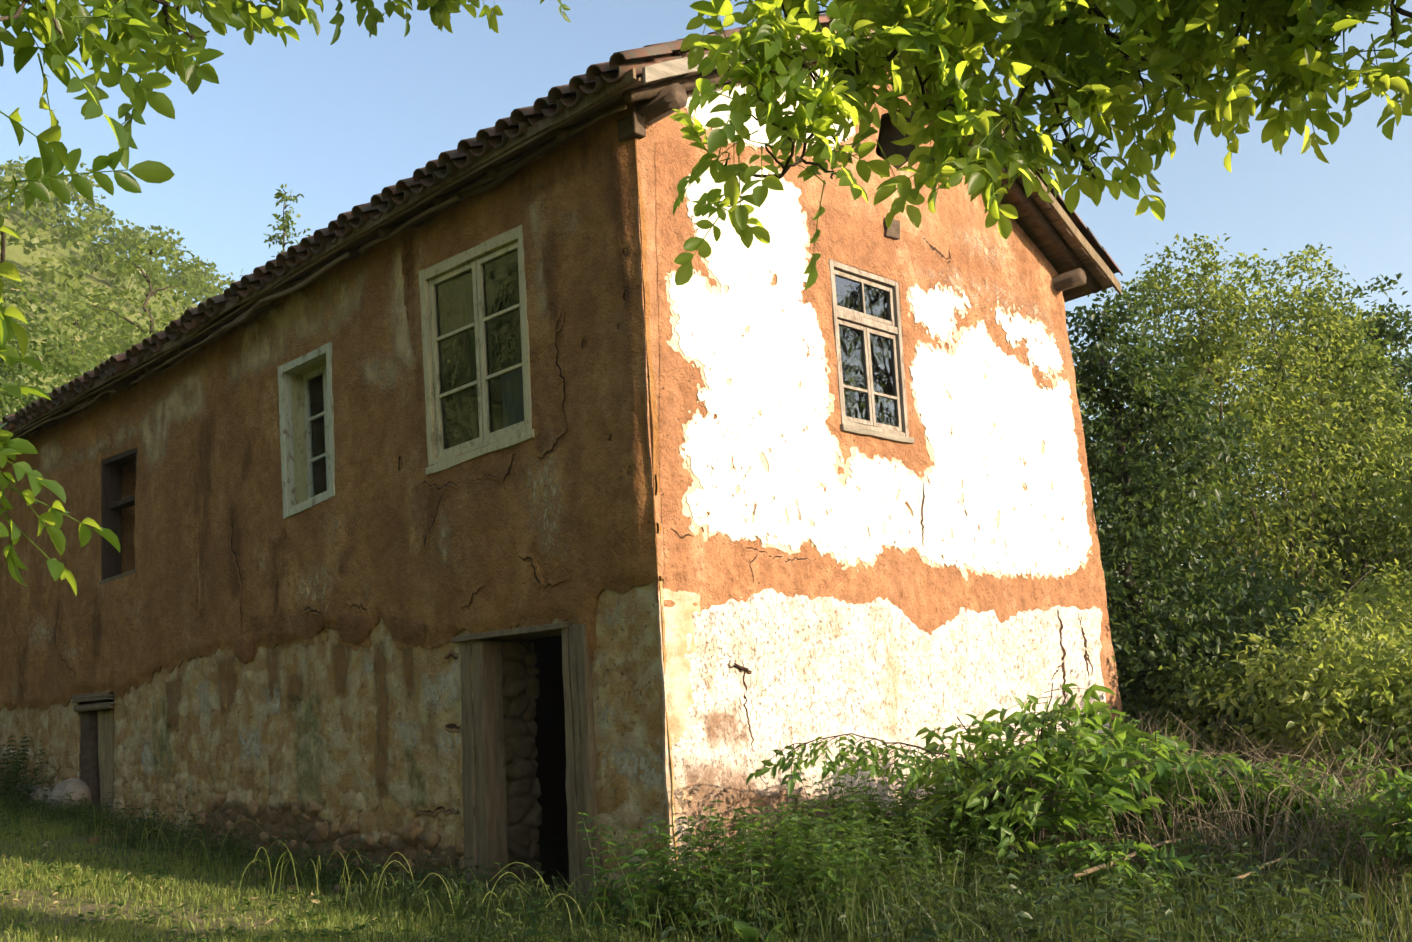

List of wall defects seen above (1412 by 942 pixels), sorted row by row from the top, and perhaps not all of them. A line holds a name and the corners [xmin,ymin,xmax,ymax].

crack [465,306,567,488]
flaking render [655,138,1108,640]
crack [517,552,570,596]
crack [729,656,771,796]
crack [1048,609,1094,714]
spalling [189,794,464,888]